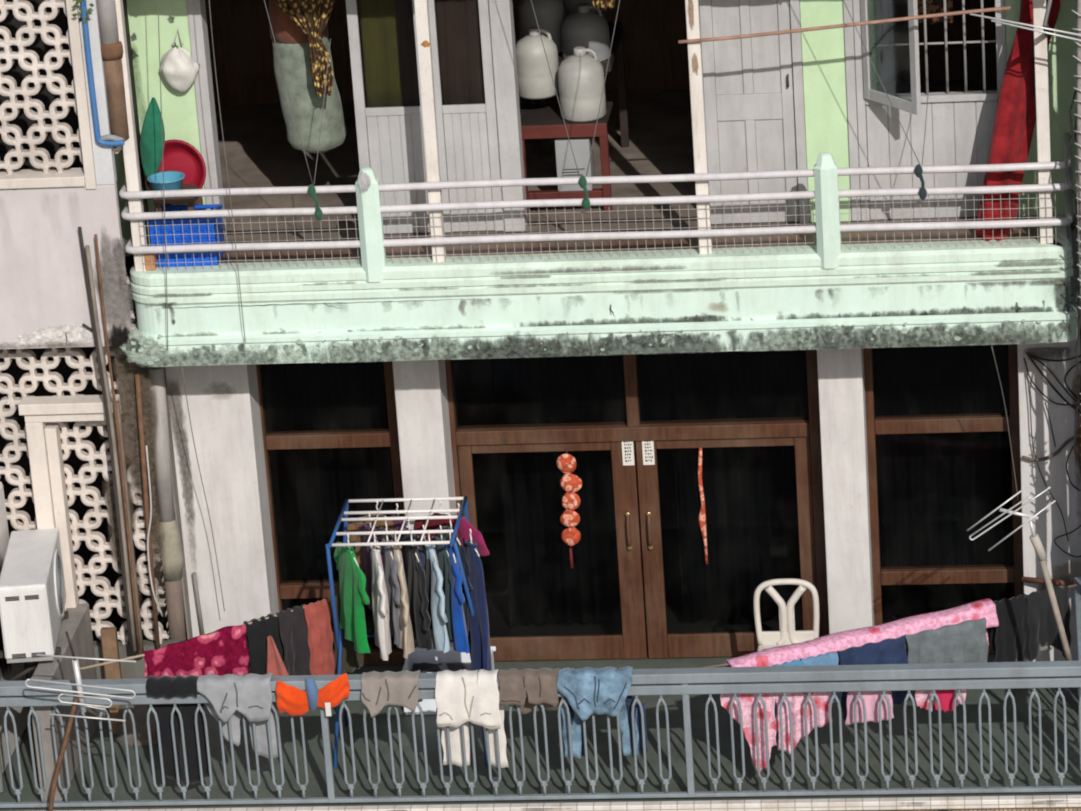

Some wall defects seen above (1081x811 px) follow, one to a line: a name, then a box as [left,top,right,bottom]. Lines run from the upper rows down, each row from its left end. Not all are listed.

leakage [115,240,130,299]
leakage [113,259,1076,572]
leakage [105,478,122,573]